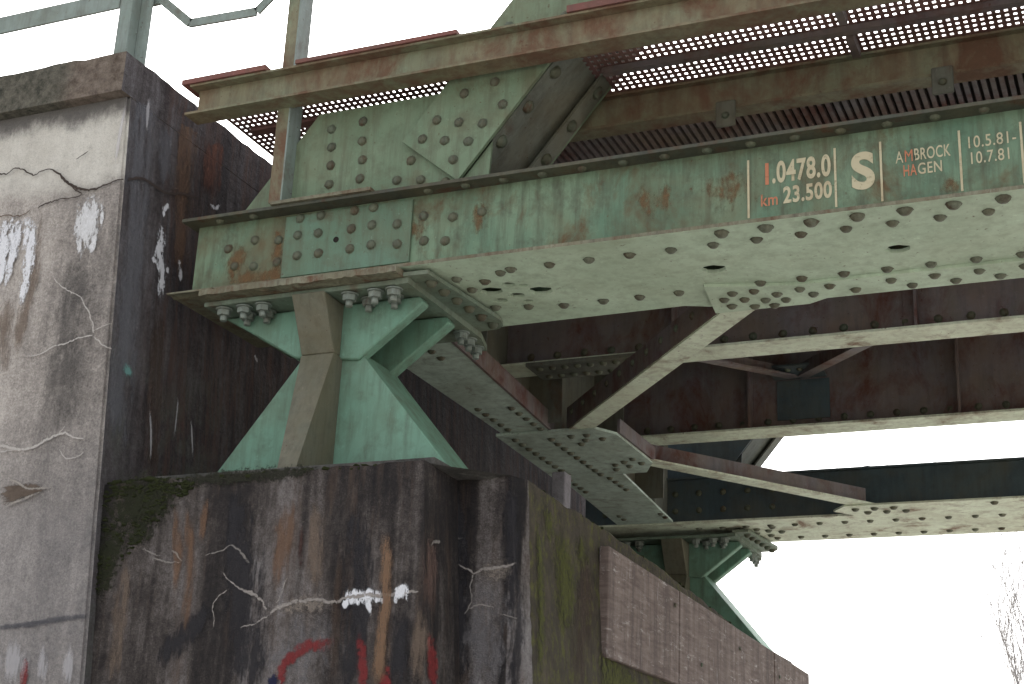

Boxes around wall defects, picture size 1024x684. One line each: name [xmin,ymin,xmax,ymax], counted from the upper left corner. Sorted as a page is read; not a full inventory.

crack [0,151,202,217]
leakage [73,195,104,257]
leakage [0,219,37,305]
leakage [108,103,182,427]
crack [25,276,112,357]
crack [0,426,83,459]
spalling [1,478,51,507]
crack [143,548,183,564]
leakage [158,493,410,684]
crack [207,545,418,628]
crack [460,561,517,619]